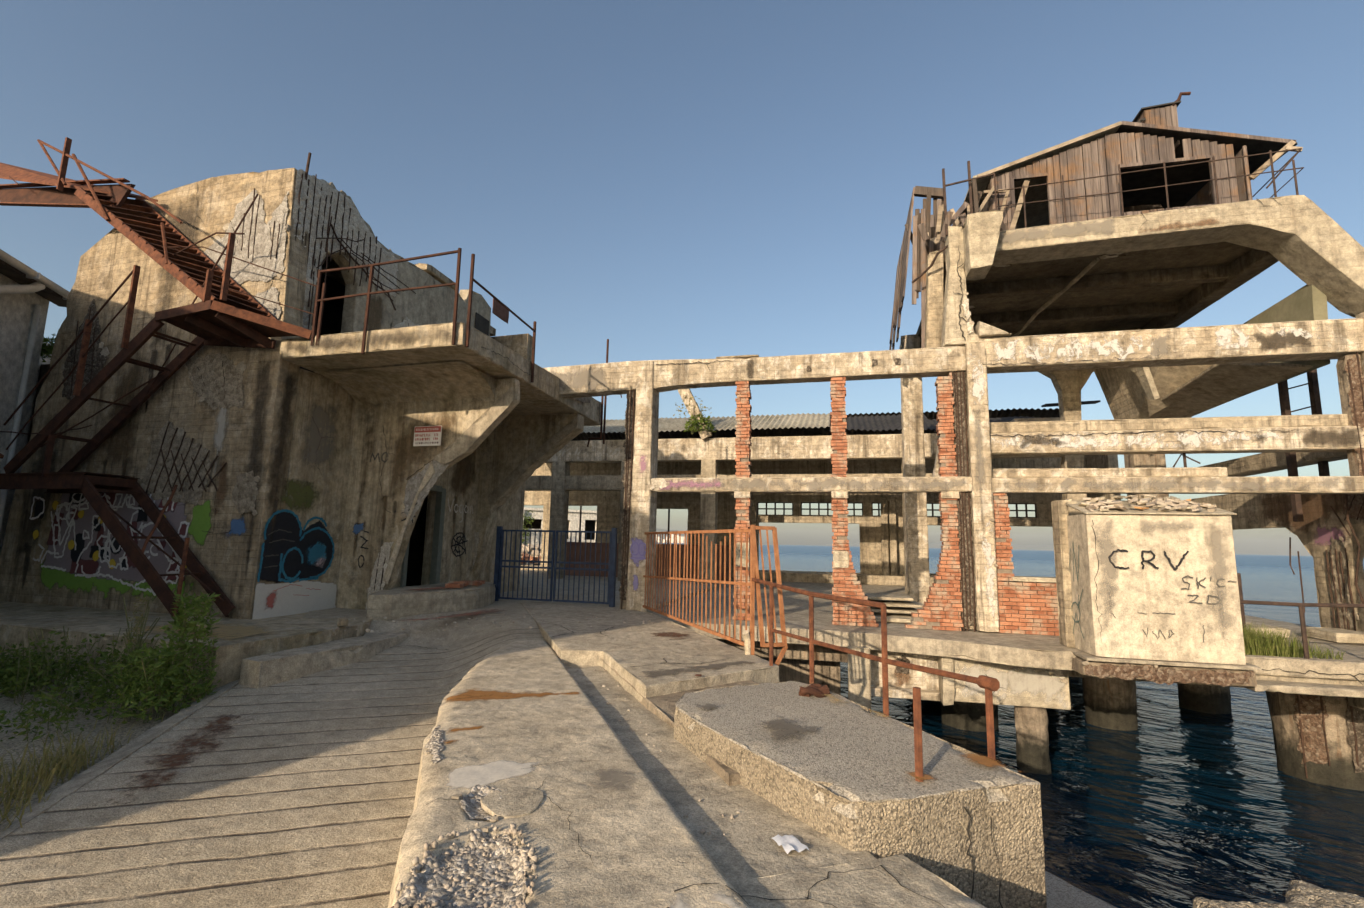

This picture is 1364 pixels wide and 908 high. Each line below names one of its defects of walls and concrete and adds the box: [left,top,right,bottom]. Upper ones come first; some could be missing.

spalling [204,152,420,329]
corrosion [894,669,910,685]
corrosion [445,690,579,702]
corrosion [964,753,1004,767]
spalling [391,784,538,908]